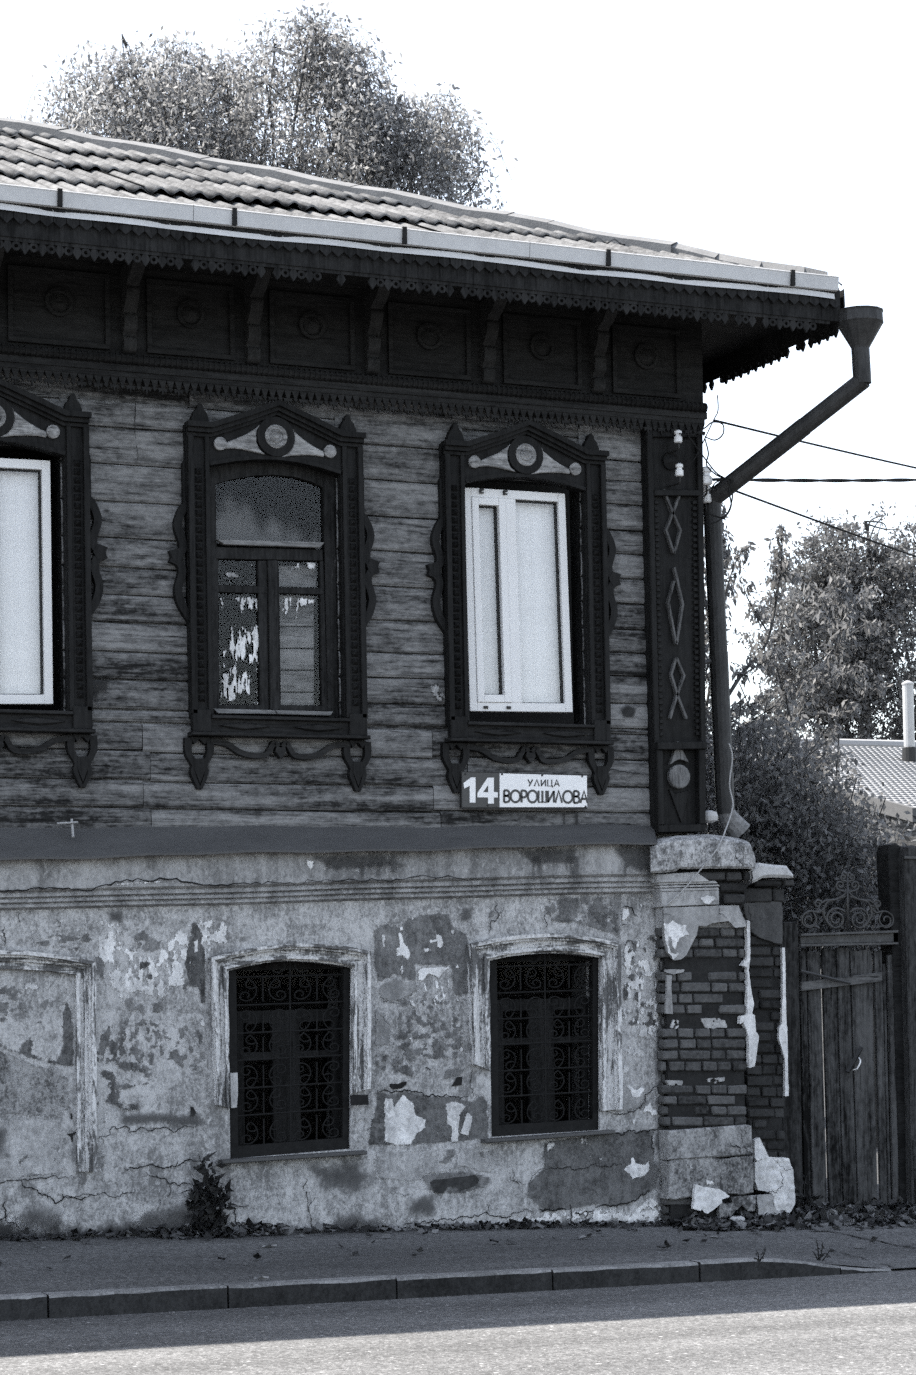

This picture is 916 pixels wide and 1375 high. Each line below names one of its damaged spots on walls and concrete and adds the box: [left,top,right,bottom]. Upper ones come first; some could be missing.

crack [0,1125,199,1228]
peeling [29,919,227,1014]
peeling [350,913,490,1193]
flaking render [528,843,794,1222]